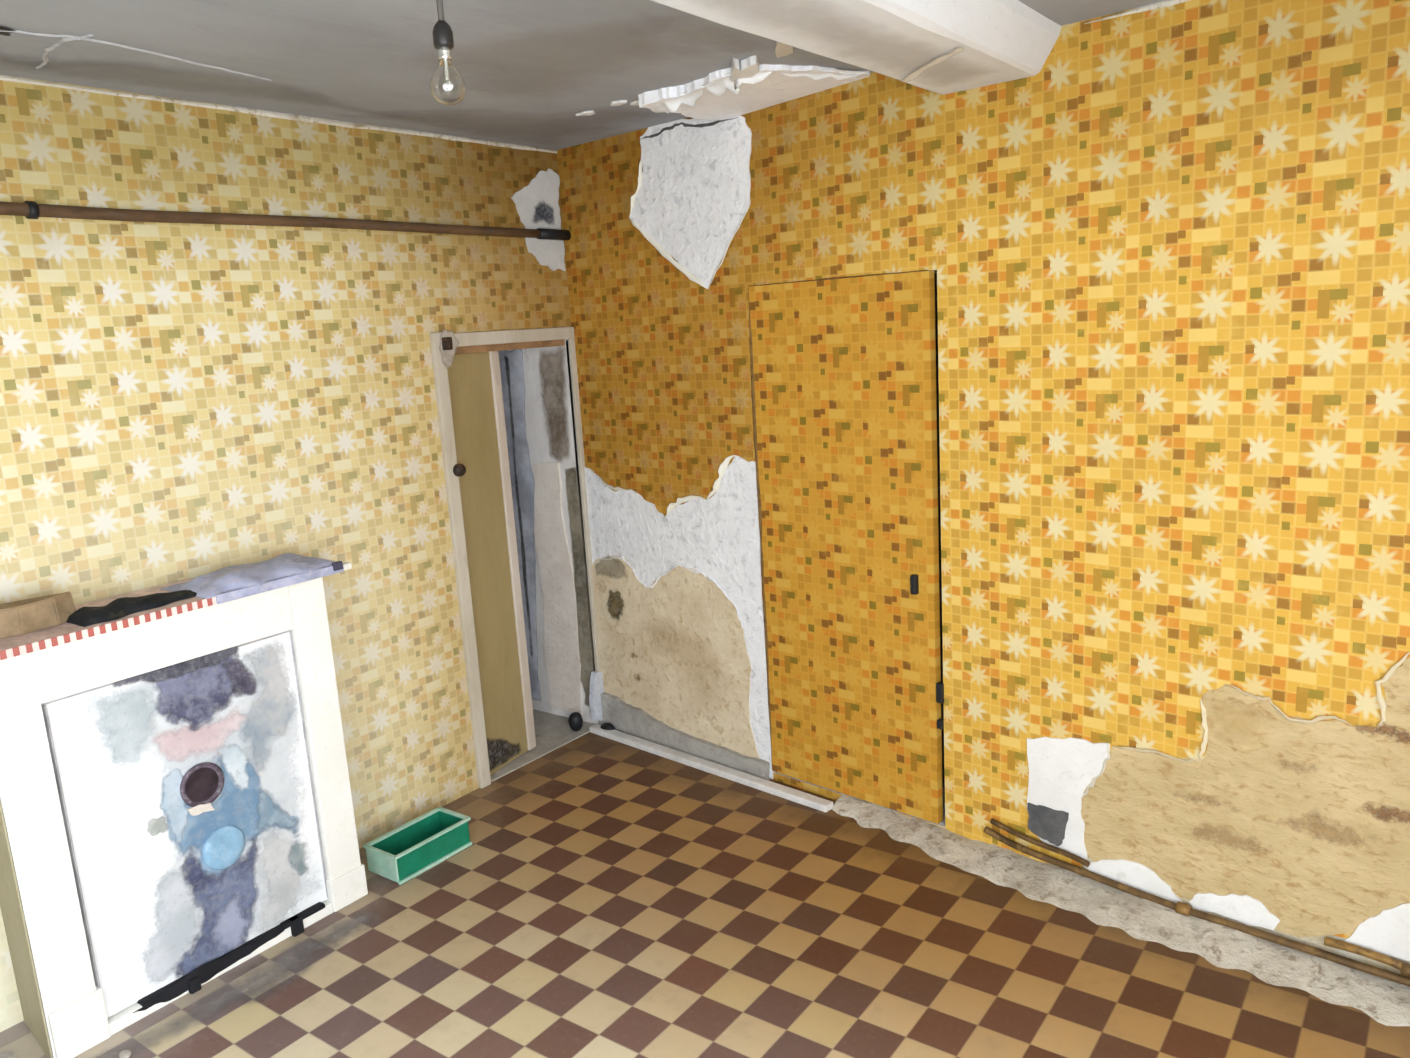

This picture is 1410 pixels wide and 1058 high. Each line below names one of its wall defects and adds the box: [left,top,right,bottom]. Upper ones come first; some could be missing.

flaking render [511,169,566,271]
flaking render [576,41,870,120]
flaking render [498,349,760,759]
flaking render [1081,652,1410,975]